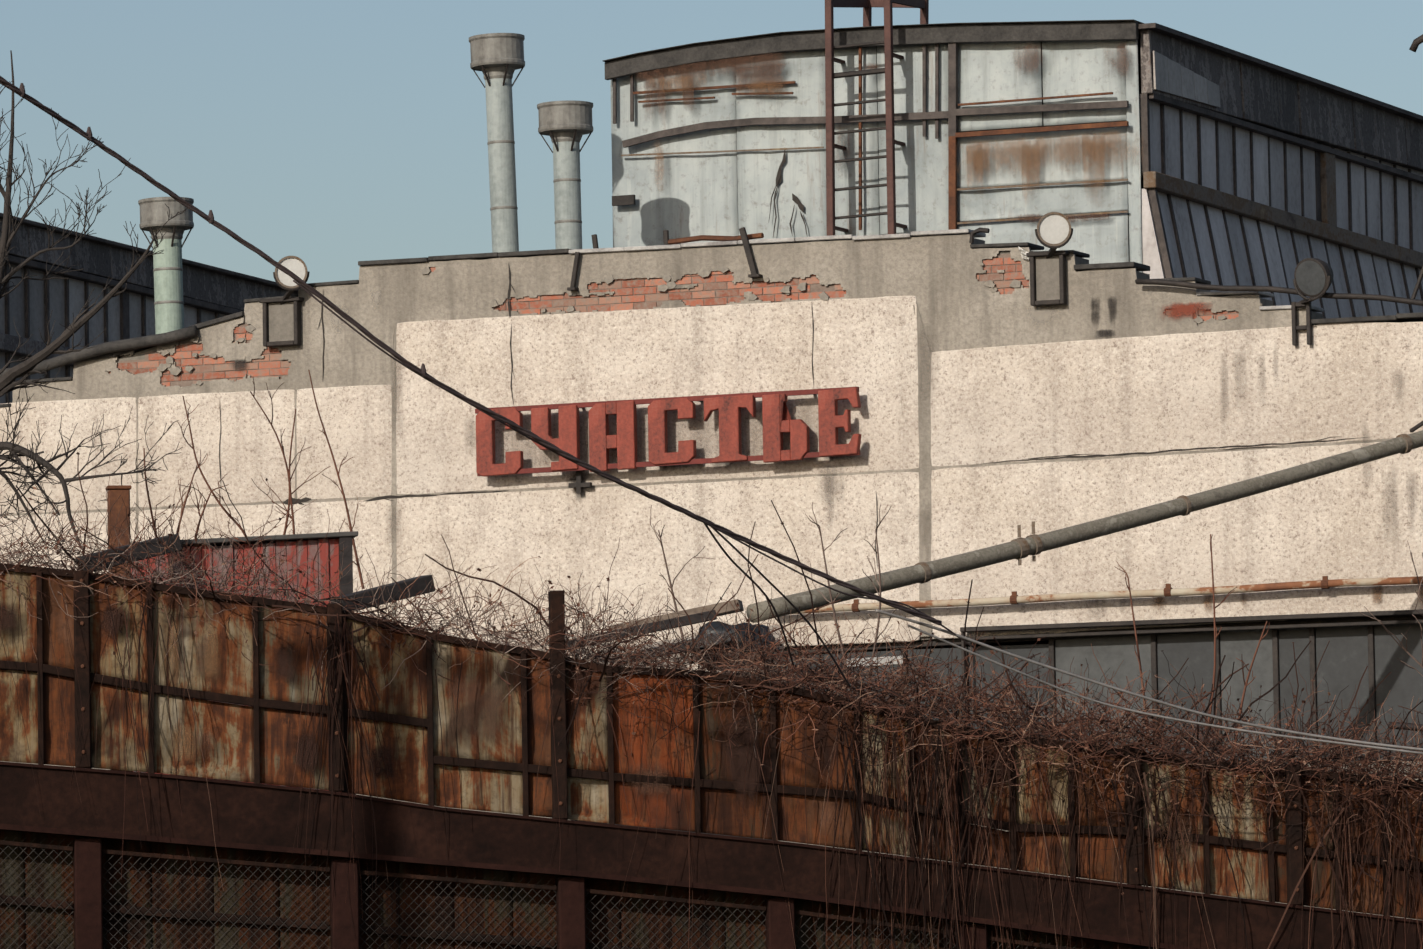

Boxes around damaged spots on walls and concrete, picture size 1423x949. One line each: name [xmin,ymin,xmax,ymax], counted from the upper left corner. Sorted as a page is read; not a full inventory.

corrosion [641,54,781,112]
corrosion [967,134,1121,180]
water stain [768,150,807,237]
flaking render [489,266,846,315]
flaking render [977,254,1029,294]
flaking render [1193,309,1239,323]
flaking render [109,323,291,387]
corrosion [0,603,17,632]
corrosion [197,634,217,674]